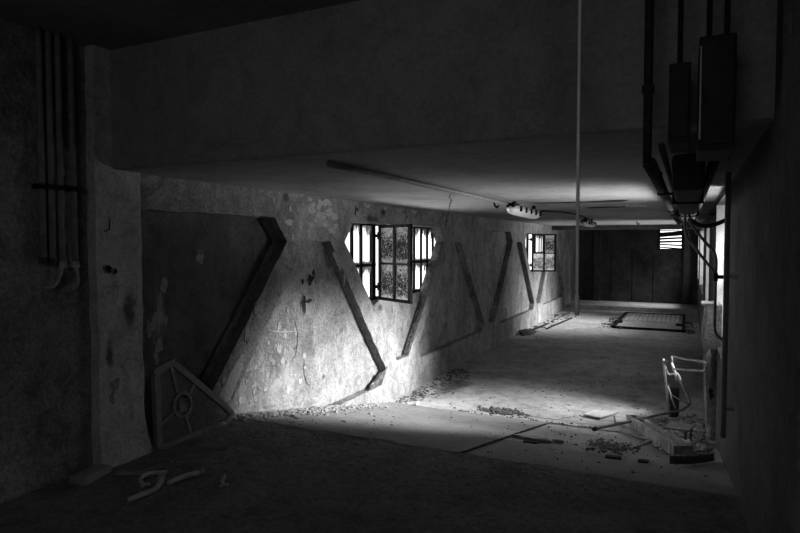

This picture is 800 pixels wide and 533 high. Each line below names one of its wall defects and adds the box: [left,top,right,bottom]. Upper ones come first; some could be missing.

peeling [284,197,338,241]
flaking render [208,269,315,419]